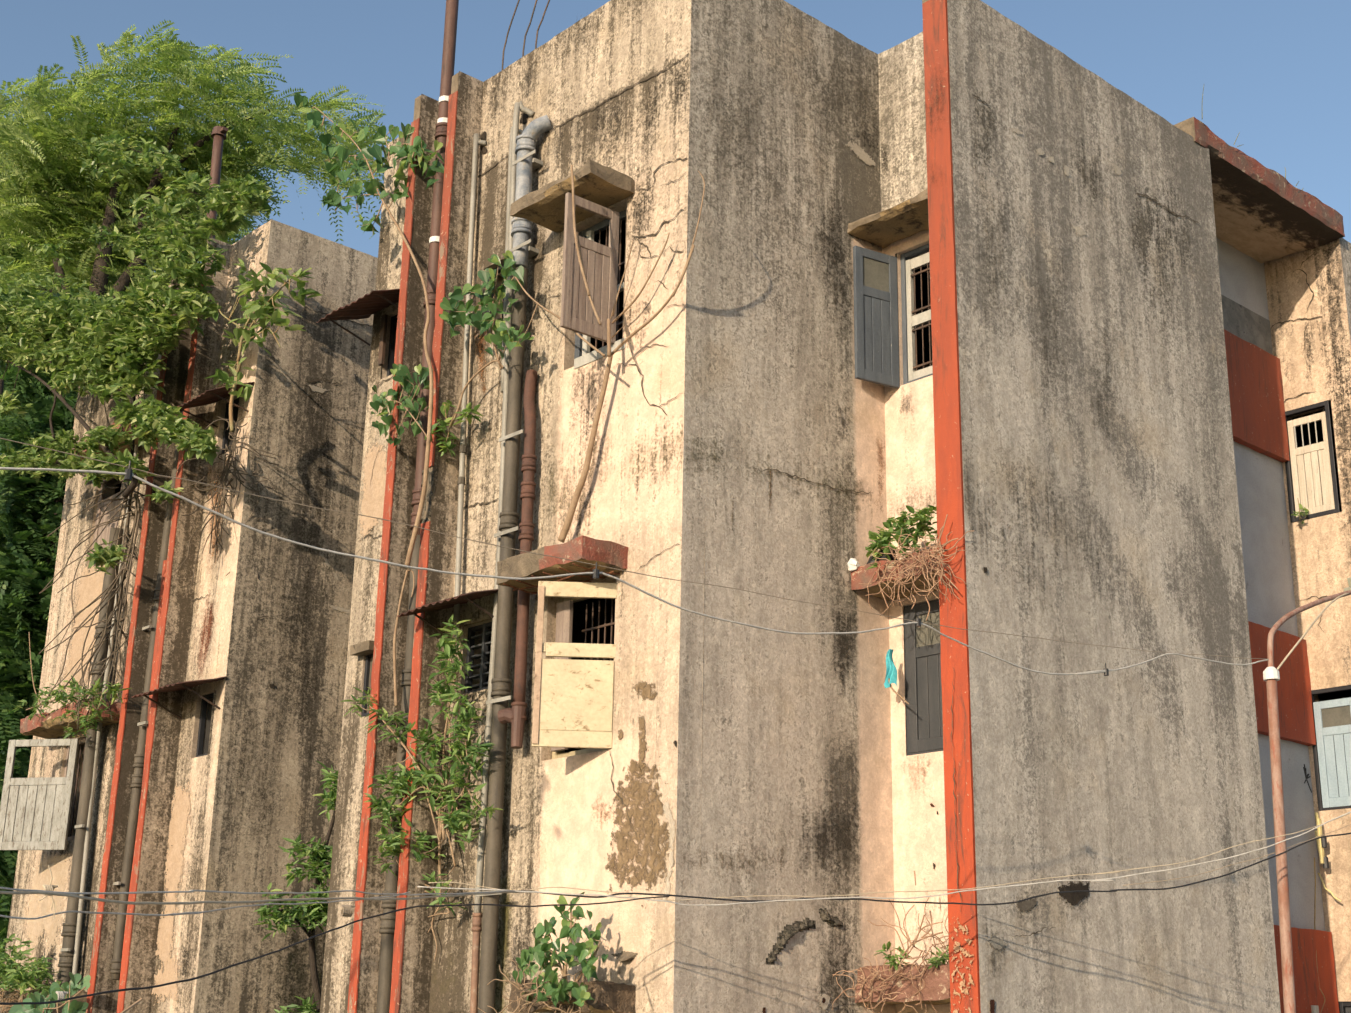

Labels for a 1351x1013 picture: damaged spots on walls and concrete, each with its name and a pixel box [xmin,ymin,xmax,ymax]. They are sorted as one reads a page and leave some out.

damp [672,70,689,117]
damp [628,184,654,238]
crack [632,157,687,307]
crack [614,344,676,415]
damp [304,375,335,538]
damp [281,571,318,722]
damp [833,613,855,685]
damp [803,745,857,872]
peeling [949,914,1008,1013]